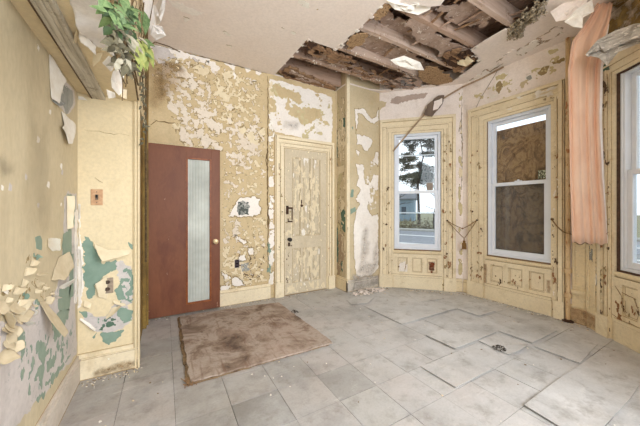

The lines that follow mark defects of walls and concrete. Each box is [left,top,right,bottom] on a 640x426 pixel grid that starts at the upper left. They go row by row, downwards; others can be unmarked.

peeling [49,54,87,144]
peeling [284,41,322,64]
peeling [441,41,487,77]
peeling [474,48,565,111]
peeling [150,45,429,294]
peeling [0,191,133,426]